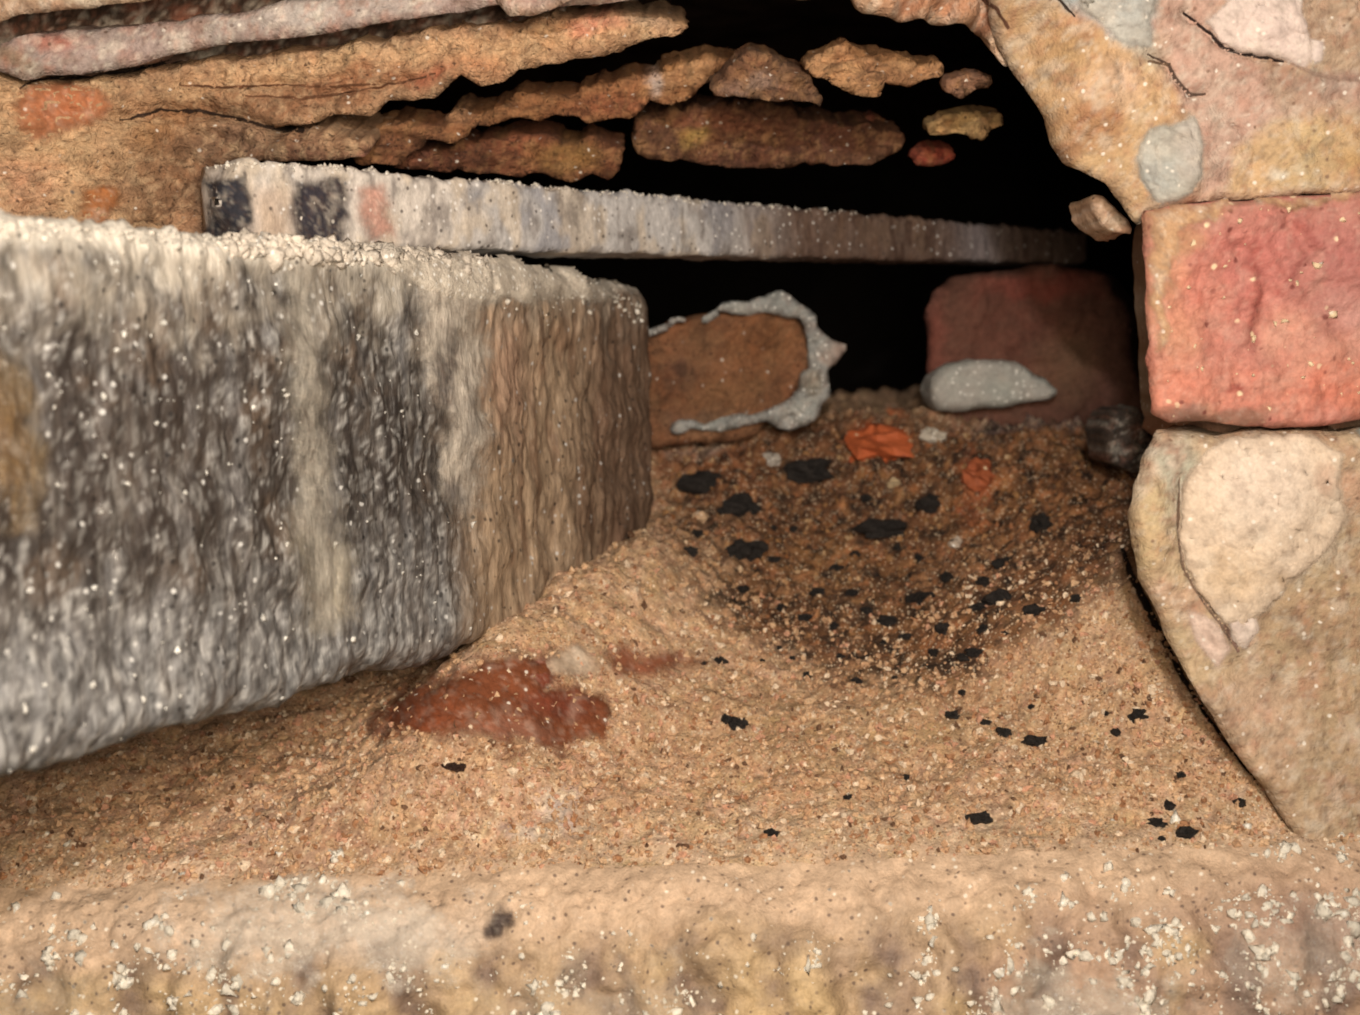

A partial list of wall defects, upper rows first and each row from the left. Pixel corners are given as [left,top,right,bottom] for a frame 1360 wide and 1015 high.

crack [982,0,1010,29]
crack [1058,0,1075,17]
crack [0,0,568,133]